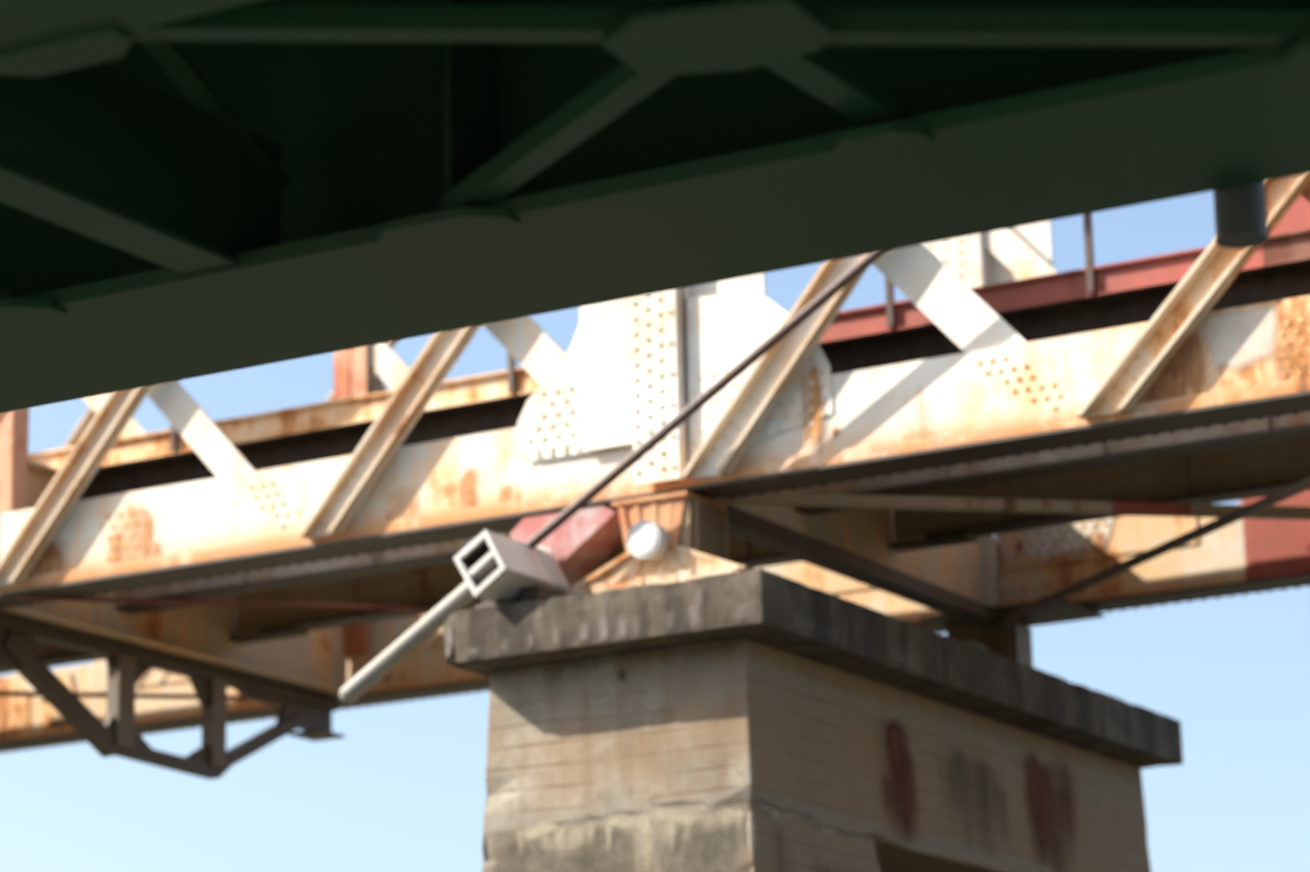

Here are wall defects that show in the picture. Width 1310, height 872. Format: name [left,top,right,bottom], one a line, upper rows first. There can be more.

rust [1136,334,1204,404]
rust [802,367,839,444]
rust [459,470,474,508]
rust [110,534,118,564]
rust [135,513,156,558]
leakage [495,809,740,872]
crack [547,792,886,842]
rust [885,722,914,837]
rust [1026,756,1072,855]